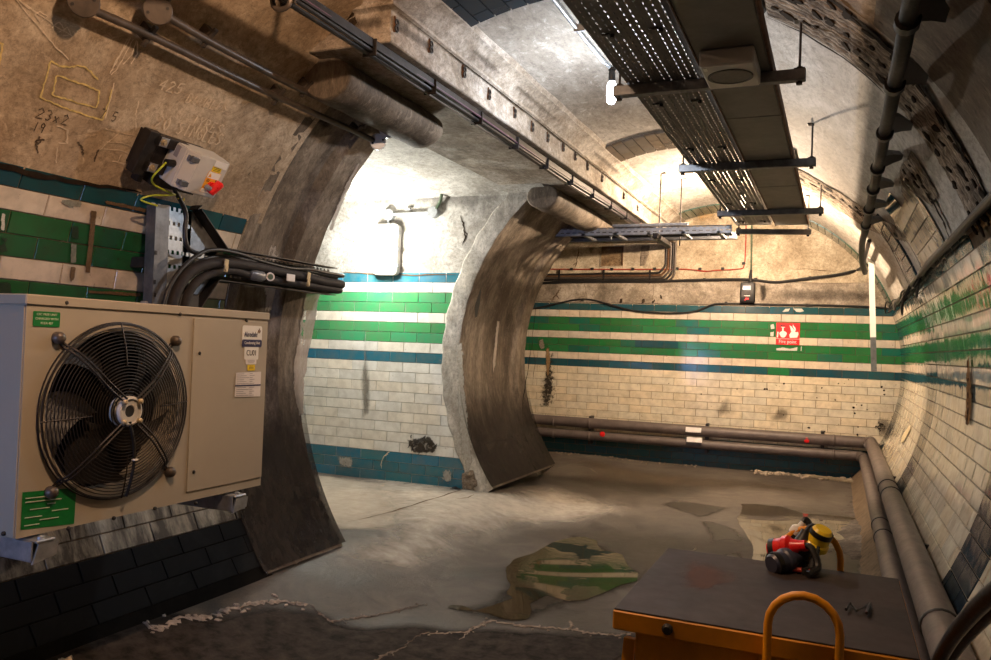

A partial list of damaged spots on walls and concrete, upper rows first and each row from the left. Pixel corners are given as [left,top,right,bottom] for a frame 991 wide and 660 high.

spalling [764,0,893,89]
spalling [899,84,991,238]
water stain [540,353,555,407]